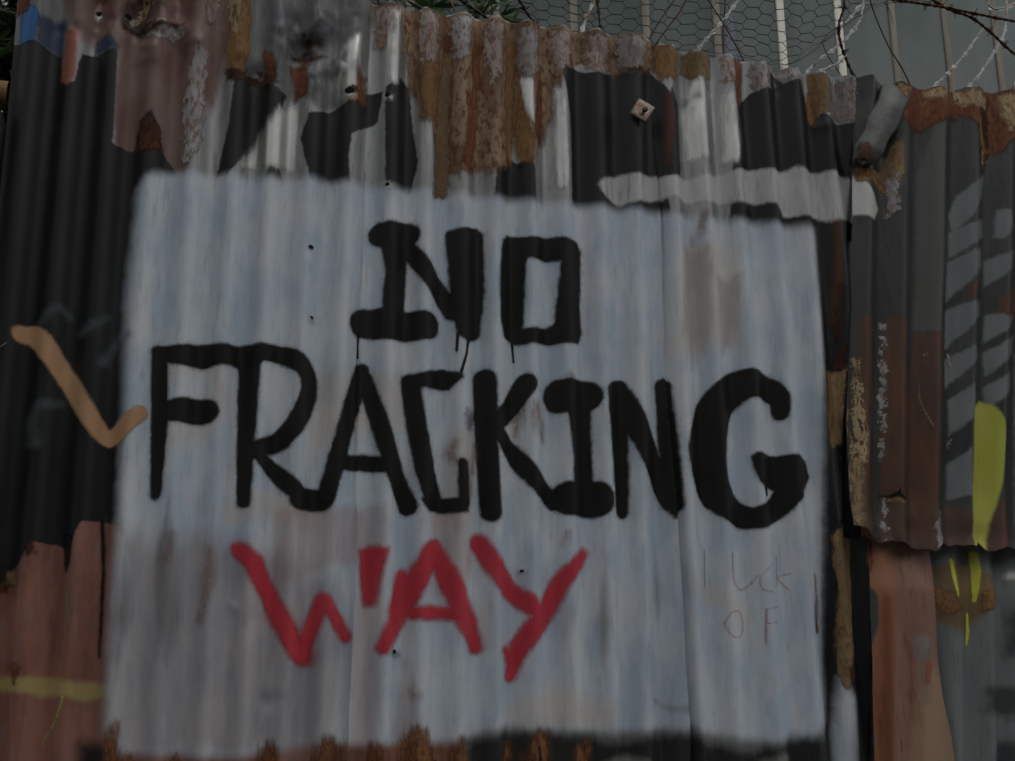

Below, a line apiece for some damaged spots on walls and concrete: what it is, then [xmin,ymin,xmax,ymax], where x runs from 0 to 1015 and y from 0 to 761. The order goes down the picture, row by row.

corrosion [372,2,678,200]
corrosion [734,57,742,105]
corrosion [136,112,163,153]
corrosion [896,82,1015,172]
corrosion [851,135,906,220]
peeling [827,323,890,525]
peeling [879,498,893,544]
peeling [927,511,943,555]
peeling [831,527,855,689]
corrosion [104,723,132,761]
corrosion [310,736,342,761]
corrosion [397,725,436,761]